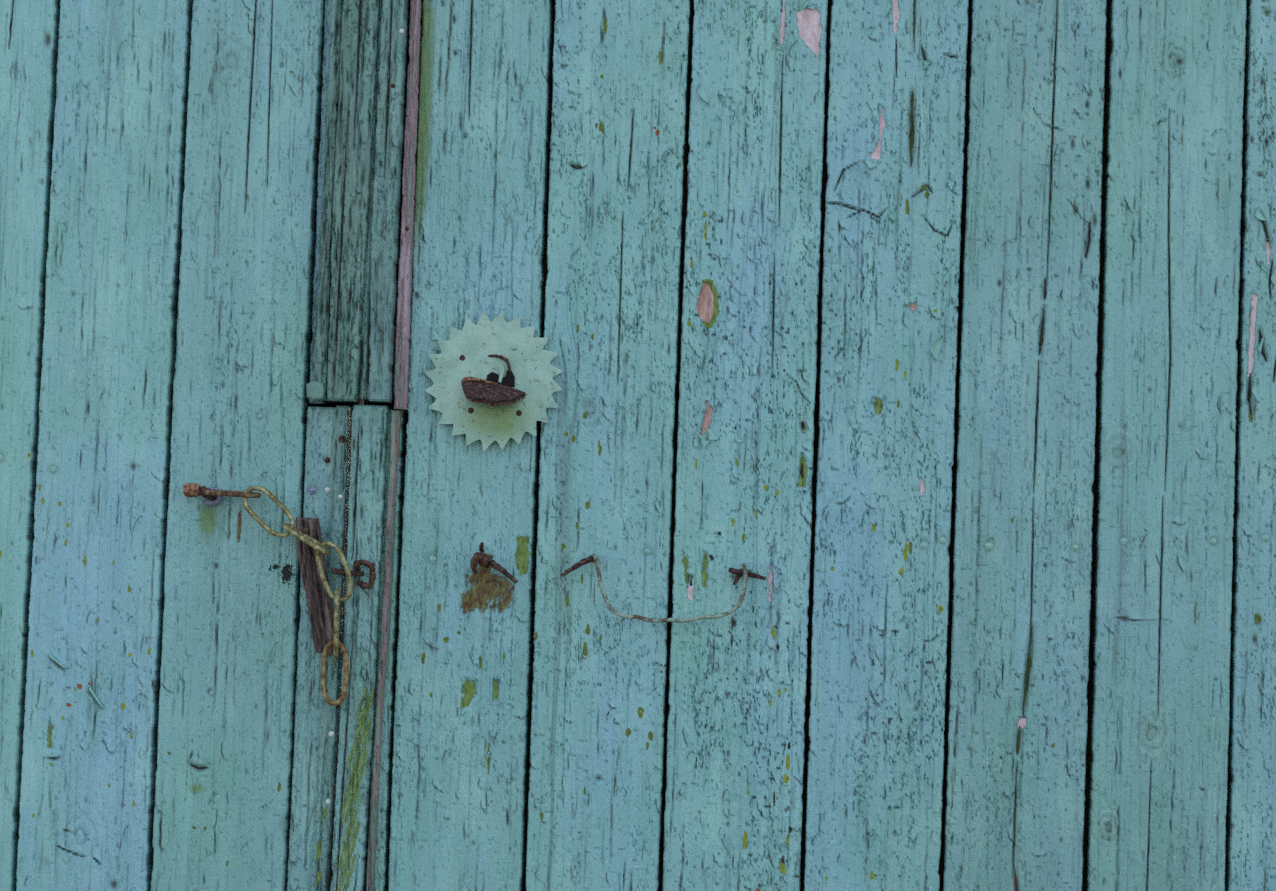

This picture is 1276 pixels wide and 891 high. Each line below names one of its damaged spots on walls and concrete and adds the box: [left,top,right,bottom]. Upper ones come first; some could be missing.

peeling [779,0,822,58]
peeling [864,107,885,169]
peeling [1265,241,1276,286]
peeling [687,279,719,328]
peeling [1247,294,1264,423]
peeling [695,402,718,469]
crack [1012,8,1057,891]
corrosion [461,552,514,614]
peeling [773,741,791,805]
peeling [779,826,792,874]